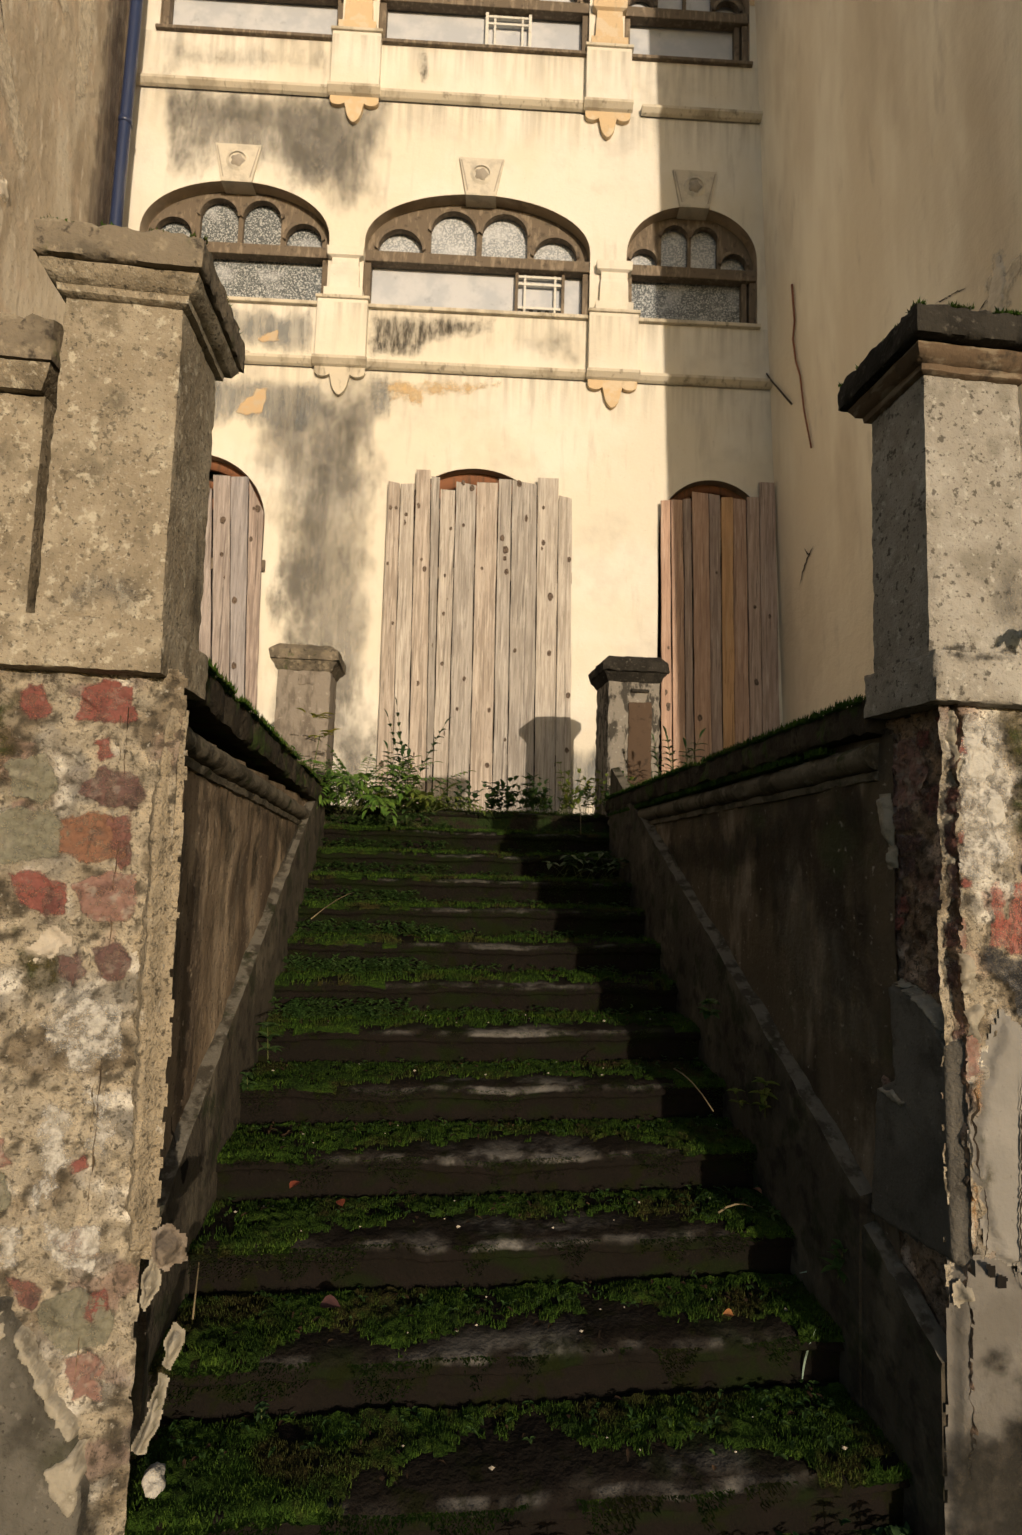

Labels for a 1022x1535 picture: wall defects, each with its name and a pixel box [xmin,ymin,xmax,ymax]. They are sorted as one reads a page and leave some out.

leakage [170,93,377,199]
flaking render [236,388,267,415]
leakage [373,318,472,354]
leakage [214,382,390,782]
spalling [0,667,188,1535]
spalling [876,704,1022,1481]
crack [971,1082,1022,1261]